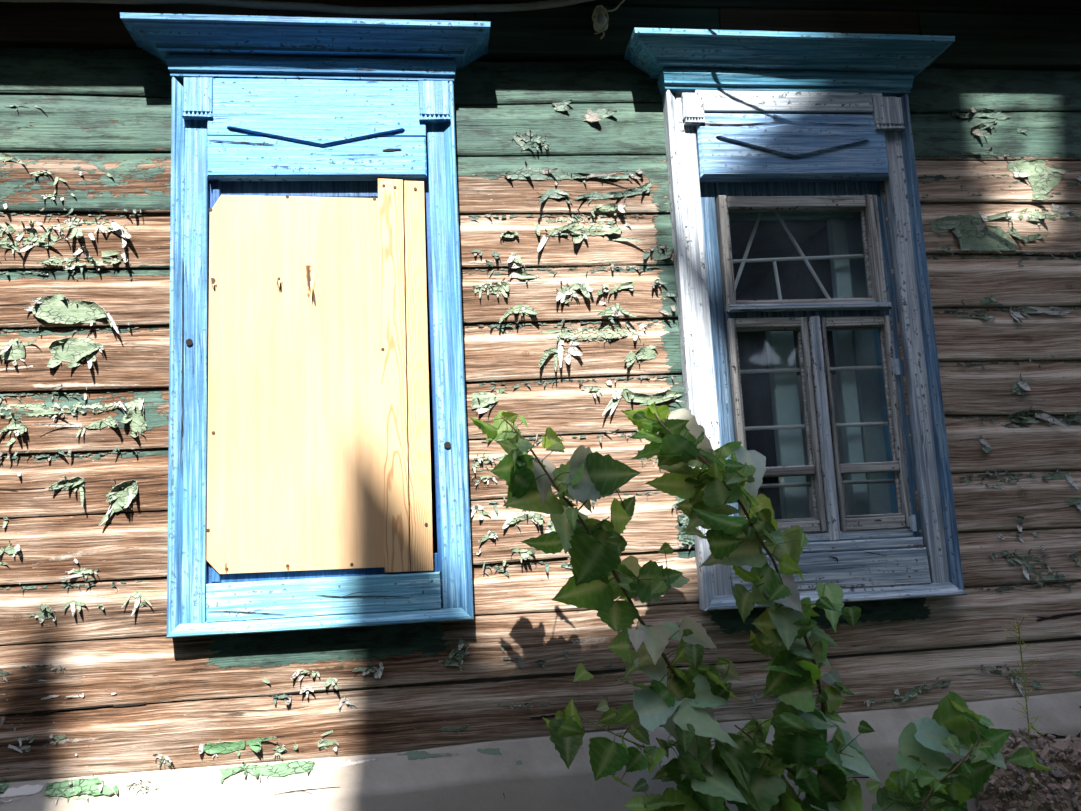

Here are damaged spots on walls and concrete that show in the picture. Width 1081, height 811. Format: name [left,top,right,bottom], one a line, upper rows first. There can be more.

peeling [928,107,1081,266]
peeling [468,130,682,416]
peeling [0,294,139,369]
peeling [0,384,147,462]
peeling [952,406,1081,453]
peeling [48,476,84,507]
peeling [99,480,138,526]
peeling [0,517,21,565]
peeling [26,559,104,623]
peeling [111,580,151,616]
peeling [262,670,357,708]
peeling [45,774,158,803]